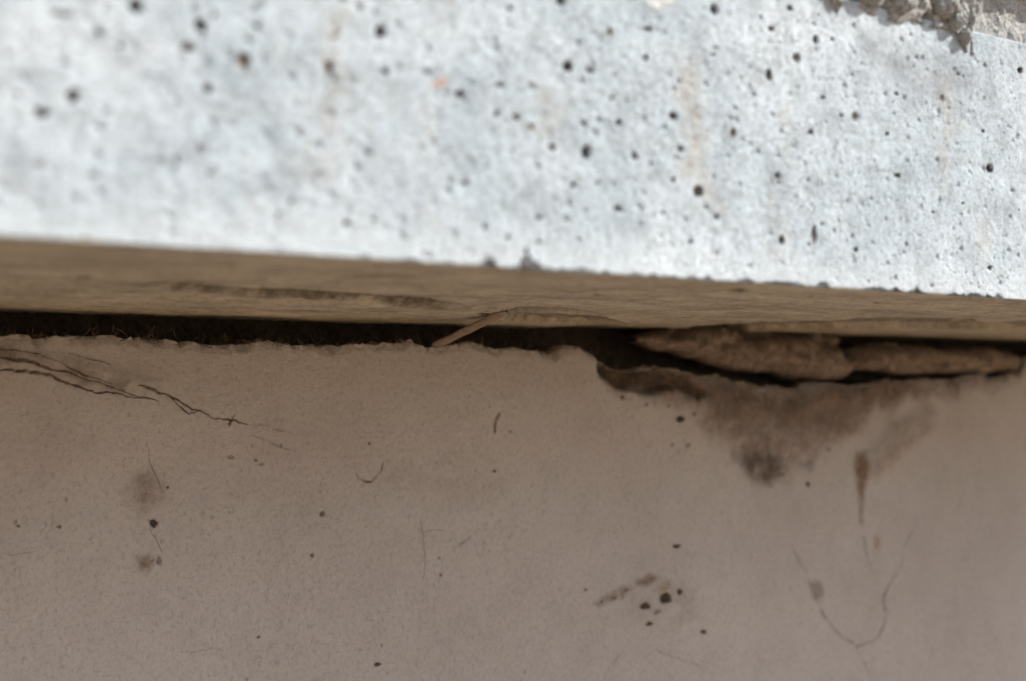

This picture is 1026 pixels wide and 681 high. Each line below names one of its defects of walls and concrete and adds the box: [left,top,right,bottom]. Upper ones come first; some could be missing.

crack [0,349,249,426]
water stain [857,455,869,497]